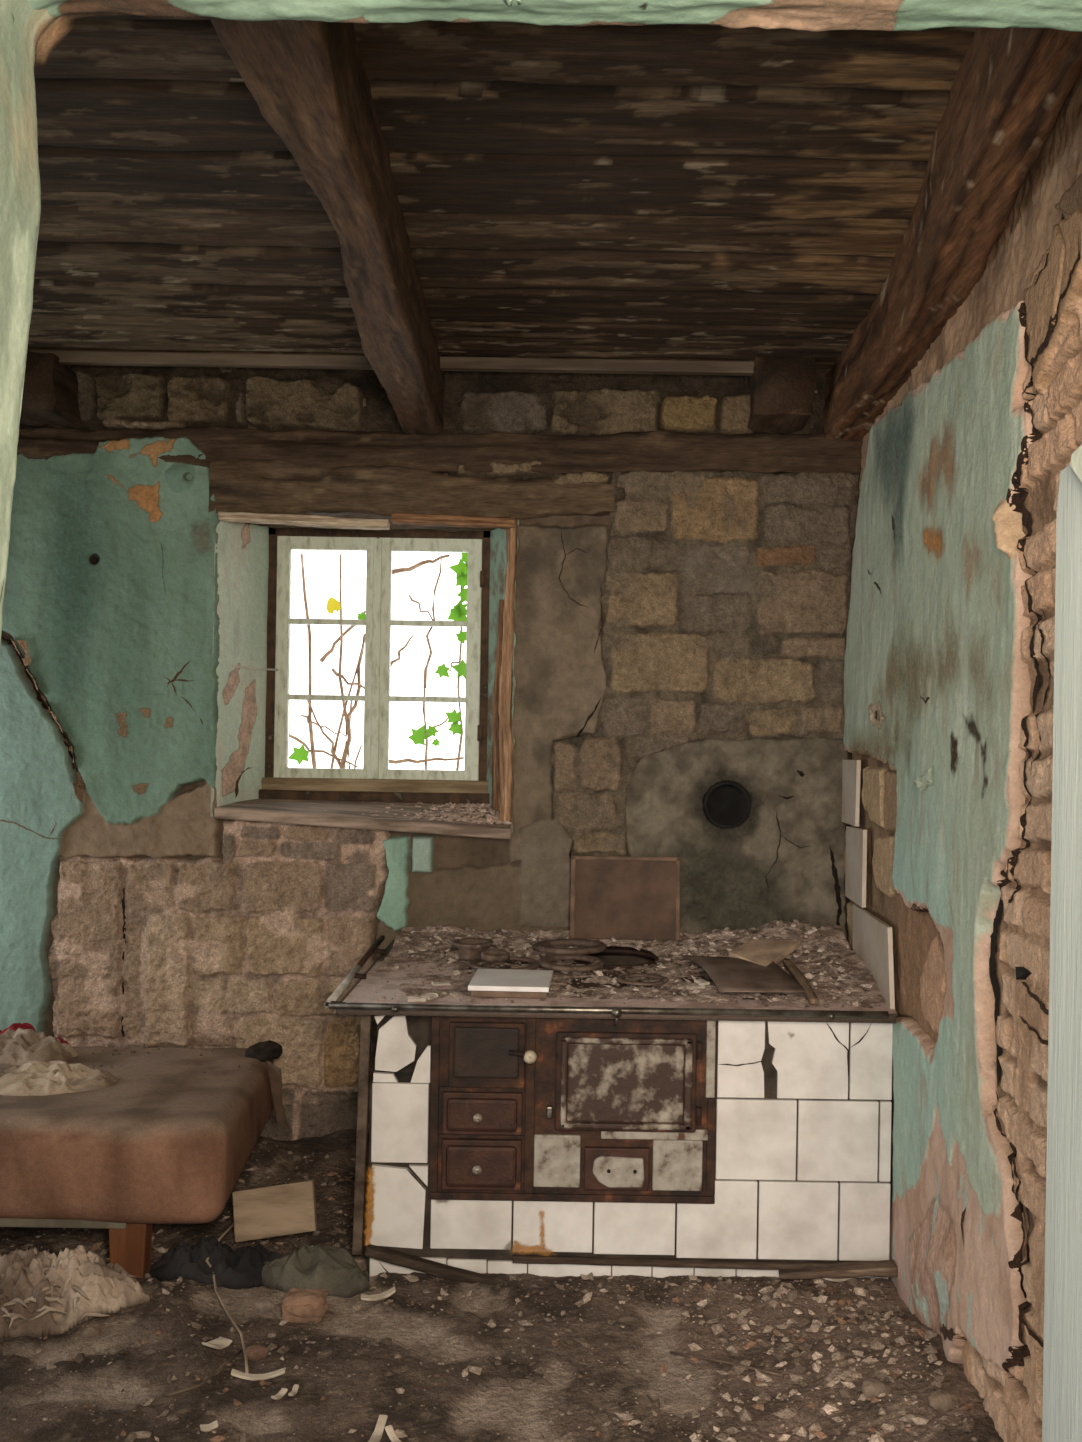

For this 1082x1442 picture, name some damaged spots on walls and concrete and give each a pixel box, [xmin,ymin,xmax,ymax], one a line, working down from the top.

flaking render [707,0,903,32]
crack [0,637,84,839]
peeling [116,708,173,737]
peeling [222,664,257,796]
crack [765,770,842,926]
flaking render [962,157,1082,1442]
crack [989,213,1081,1378]
flaking render [48,820,391,1141]
crack [826,1022,871,1080]